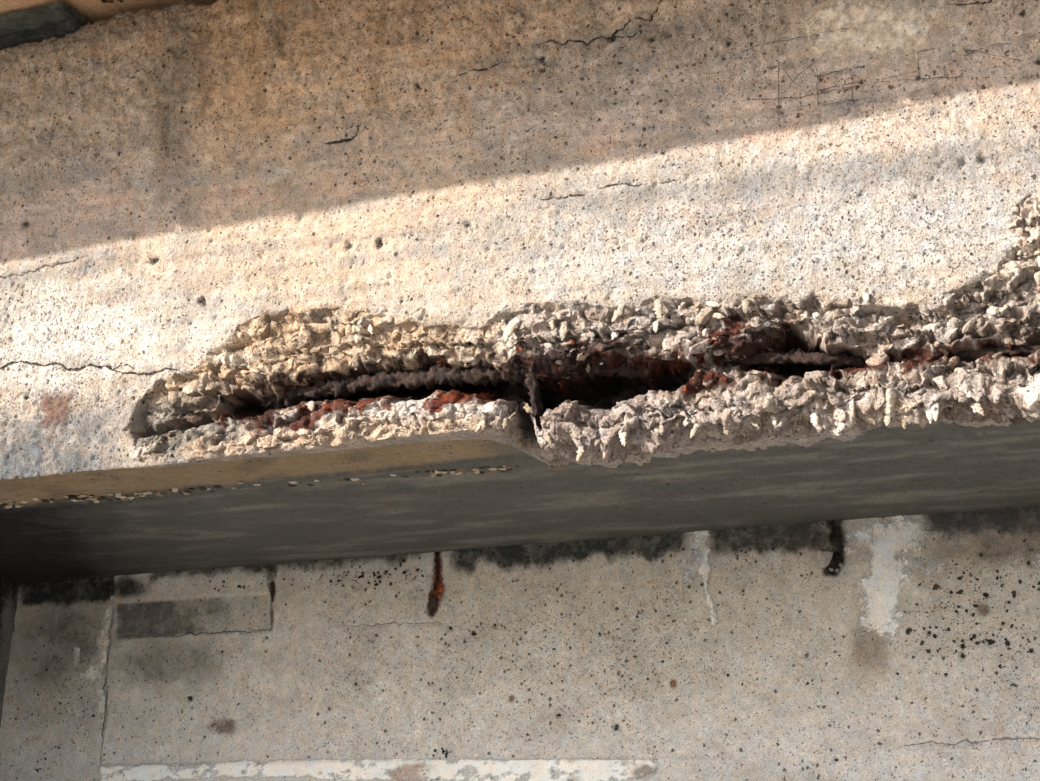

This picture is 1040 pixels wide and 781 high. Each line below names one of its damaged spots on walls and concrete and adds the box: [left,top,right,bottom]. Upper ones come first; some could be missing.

crack [535,0,662,46]
crack [457,61,503,76]
crack [324,125,360,144]
crack [537,179,676,200]
crack [0,258,78,279]
spalling [122,190,1040,469]
crack [0,360,185,375]
rust [427,552,445,617]
leakage [452,521,822,625]
leakage [844,506,1040,636]